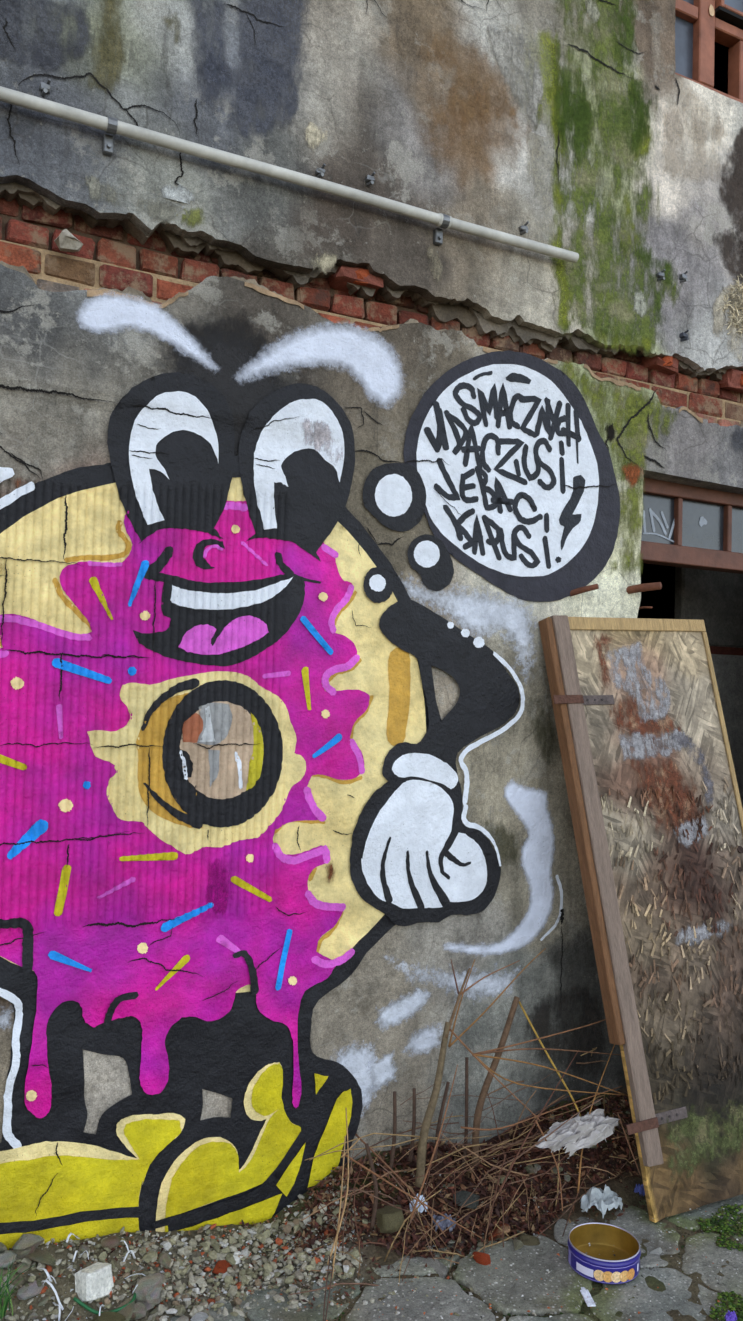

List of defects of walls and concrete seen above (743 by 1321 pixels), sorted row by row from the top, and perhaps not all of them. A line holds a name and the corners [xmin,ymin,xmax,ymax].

damp [0,0,125,89]
crack [3,19,198,190]
damp [191,0,304,136]
damp [715,128,743,281]
flaking render [0,176,743,427]
crack [0,384,216,459]
crack [252,417,296,469]
crack [0,433,156,698]